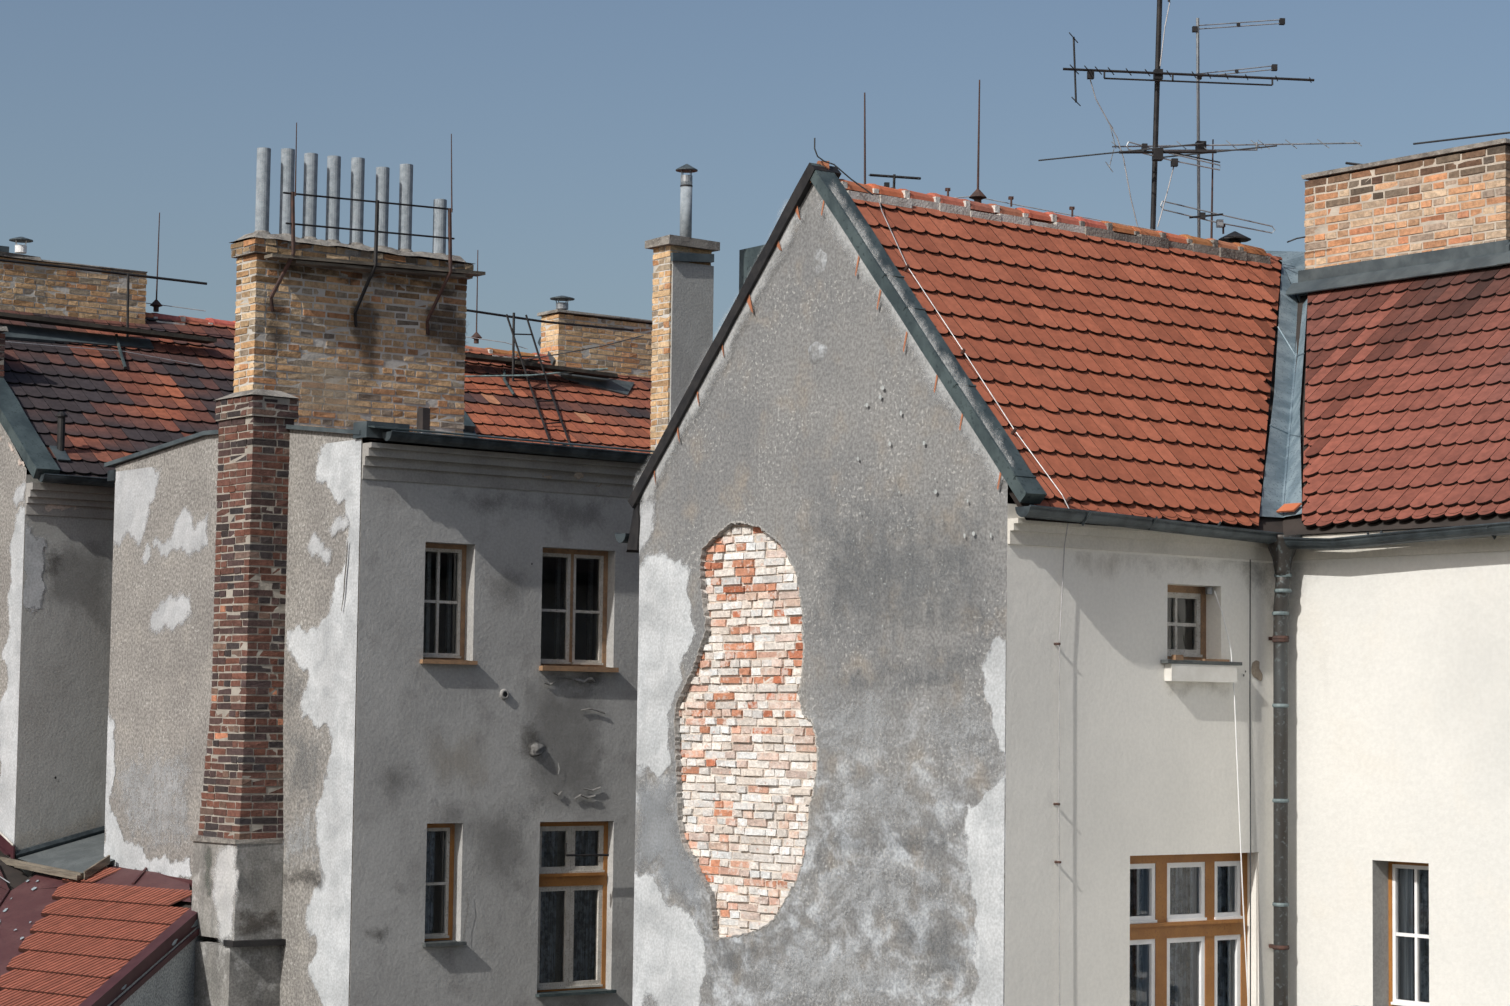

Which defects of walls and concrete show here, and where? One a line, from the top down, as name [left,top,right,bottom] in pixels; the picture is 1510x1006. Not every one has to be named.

leakage [632,500,707,1006]
flaking render [673,521,819,941]
leakage [755,945,930,1004]
leakage [964,777,1005,1006]